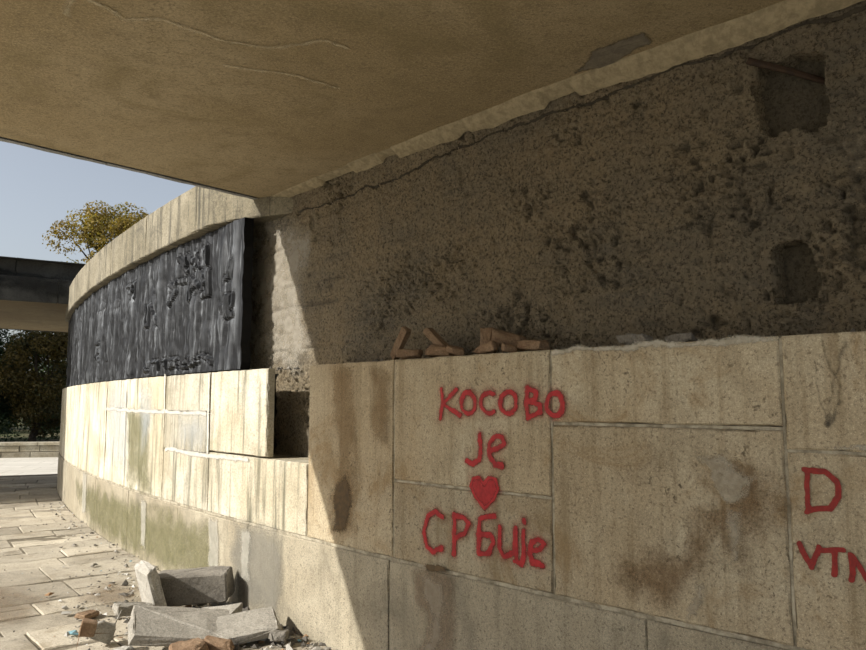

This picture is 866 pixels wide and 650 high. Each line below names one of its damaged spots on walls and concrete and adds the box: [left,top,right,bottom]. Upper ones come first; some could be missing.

peeling [273,0,864,198]
crack [298,5,866,216]
leakage [209,520,218,566]